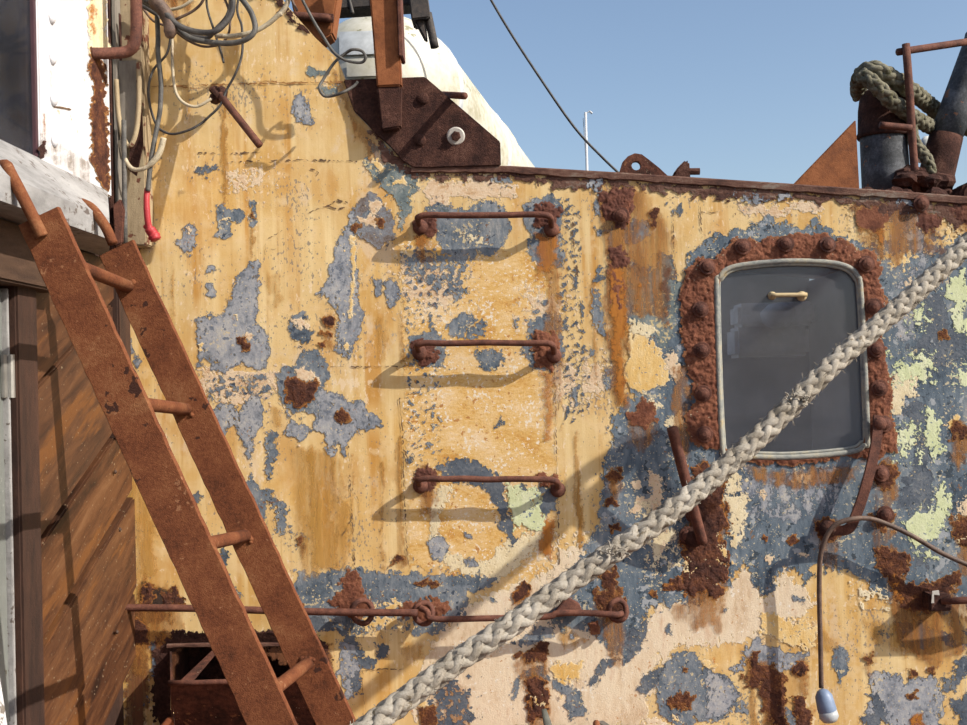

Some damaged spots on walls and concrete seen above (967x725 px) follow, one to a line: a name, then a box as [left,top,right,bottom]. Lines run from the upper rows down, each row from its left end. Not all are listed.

corrosion [87,46,112,192]
peeling [191,137,965,565]
corrosion [350,118,967,445]
peeling [293,535,498,700]
corrosion [511,580,532,605]
corrosion [513,641,563,725]
corrosion [561,564,630,664]
peeling [509,516,702,723]
corrosion [662,480,737,631]
corrosion [740,650,814,725]
peeling [636,259,967,725]
corrosion [868,458,967,666]